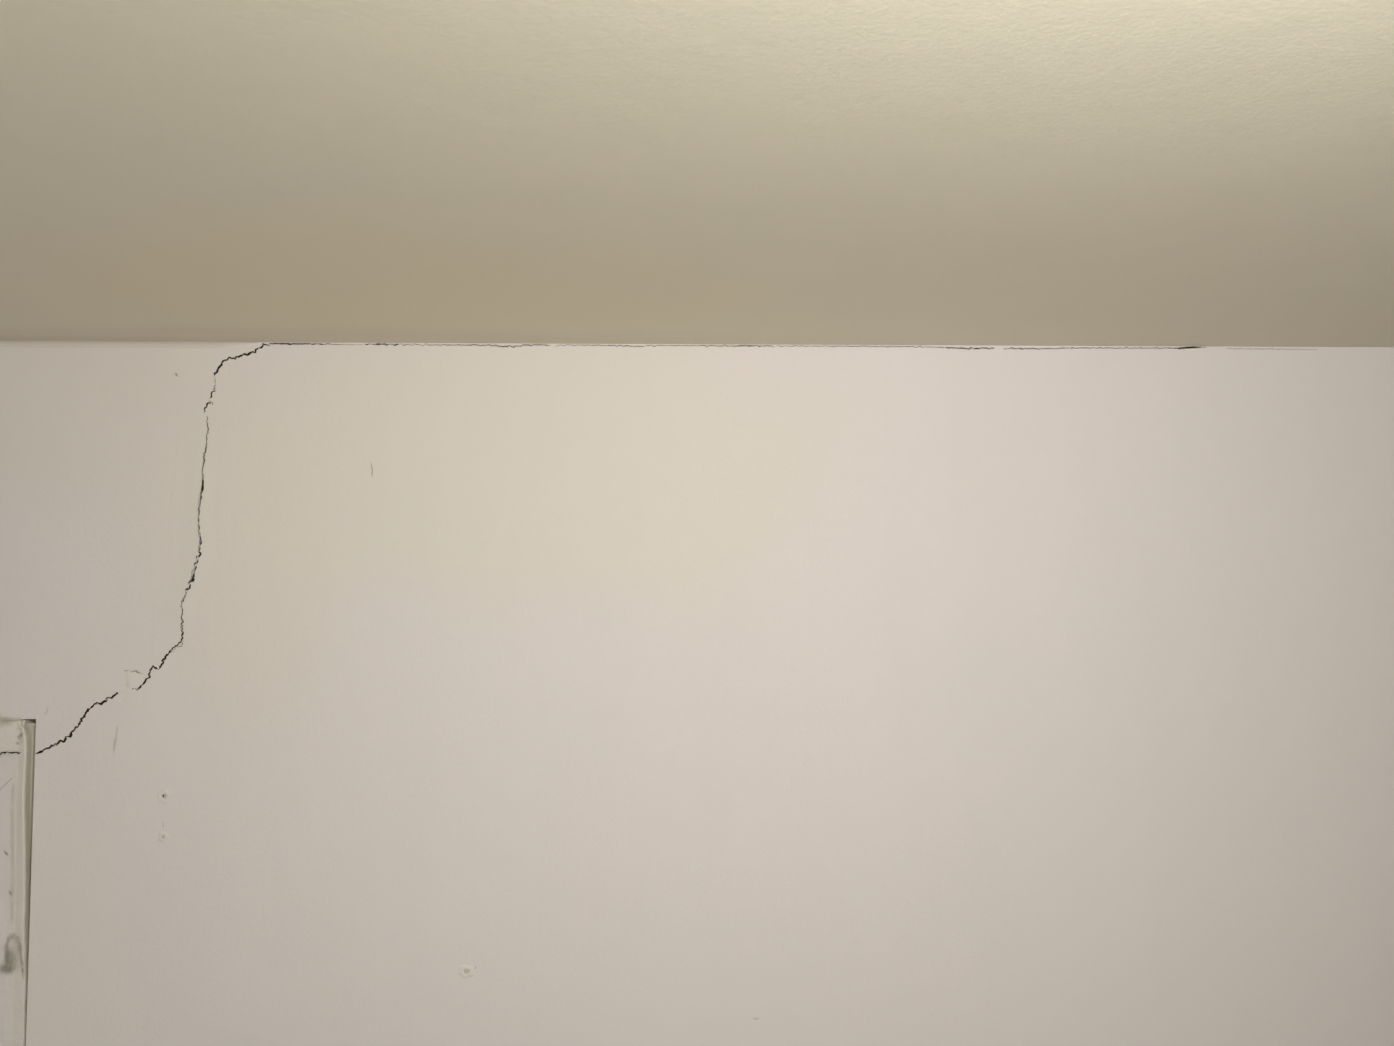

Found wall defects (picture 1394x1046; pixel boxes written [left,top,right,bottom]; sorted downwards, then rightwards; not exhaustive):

crack [0,342,1317,756]